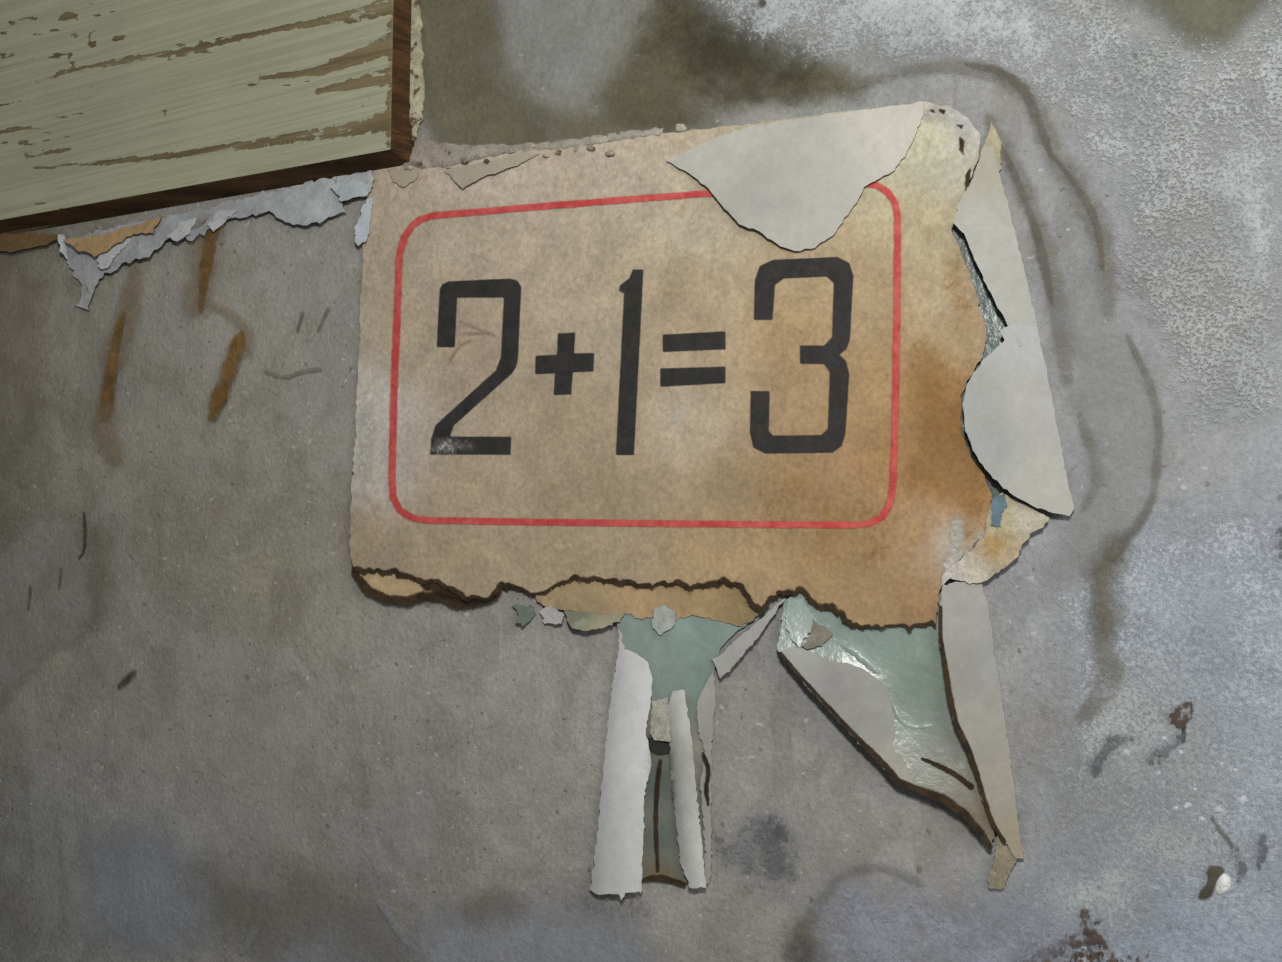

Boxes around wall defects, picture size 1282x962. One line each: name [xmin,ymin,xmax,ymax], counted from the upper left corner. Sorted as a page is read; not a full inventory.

corrosion [199,222,220,311]
peeling [57,168,418,310]
corrosion [98,311,125,419]
corrosion [208,331,244,420]
damp [419,0,1282,962]